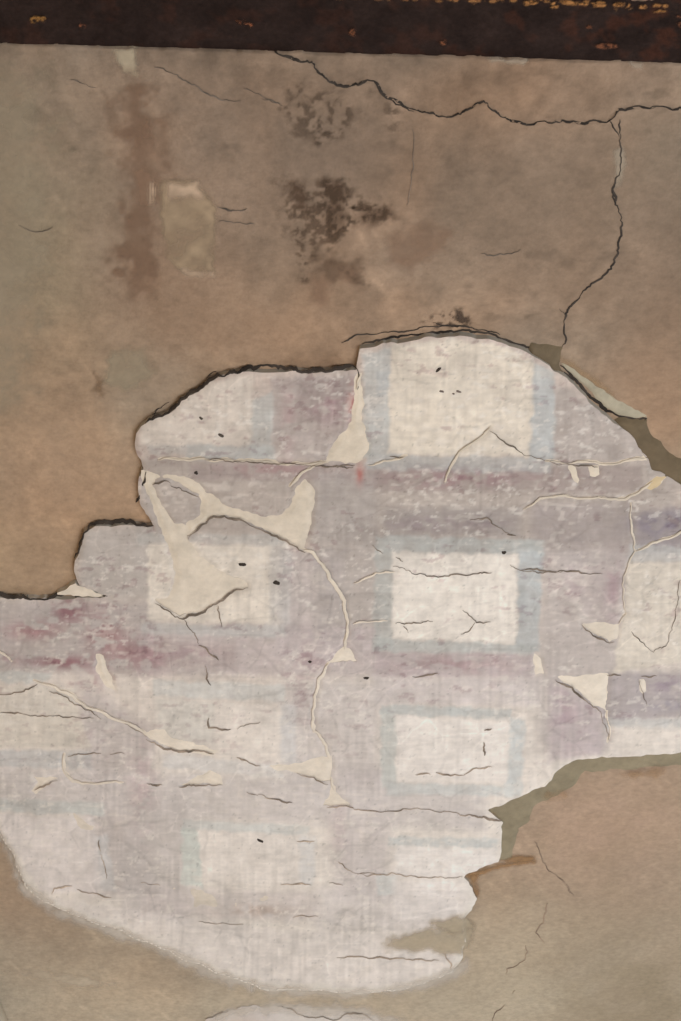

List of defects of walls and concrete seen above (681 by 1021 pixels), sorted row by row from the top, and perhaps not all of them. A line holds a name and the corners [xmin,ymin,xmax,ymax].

rust [436,0,668,12]
crack [274,51,681,420]
spalling [327,374,368,463]
spalling [568,465,579,483]
spalling [141,466,314,615]
spalling [57,579,103,597]
spalling [582,622,619,642]
spalling [97,655,114,688]
spalling [558,673,608,710]
spalling [143,729,215,753]
spalling [388,916,474,954]
crack [492,842,574,1021]